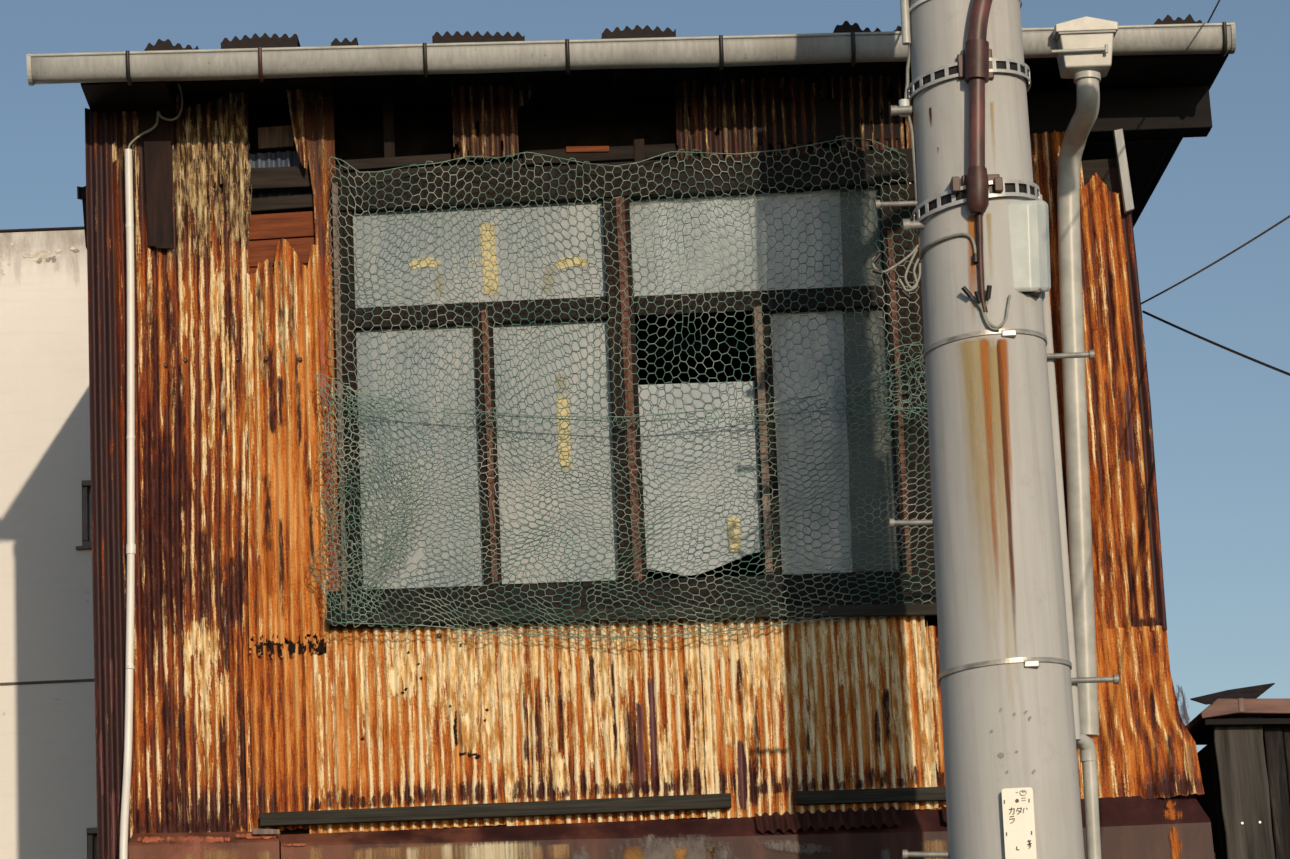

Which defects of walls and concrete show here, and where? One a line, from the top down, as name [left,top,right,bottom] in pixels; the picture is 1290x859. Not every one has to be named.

rust [112,142,121,354]
peeling [168,92,295,517]
rust [117,281,250,833]
rust [264,475,285,615]
rust [266,344,302,445]
rust [963,339,1015,597]
rust [1109,271,1161,628]
rust [312,782,497,810]
rust [513,663,702,799]
rust [737,659,918,811]
rust [1146,686,1197,859]